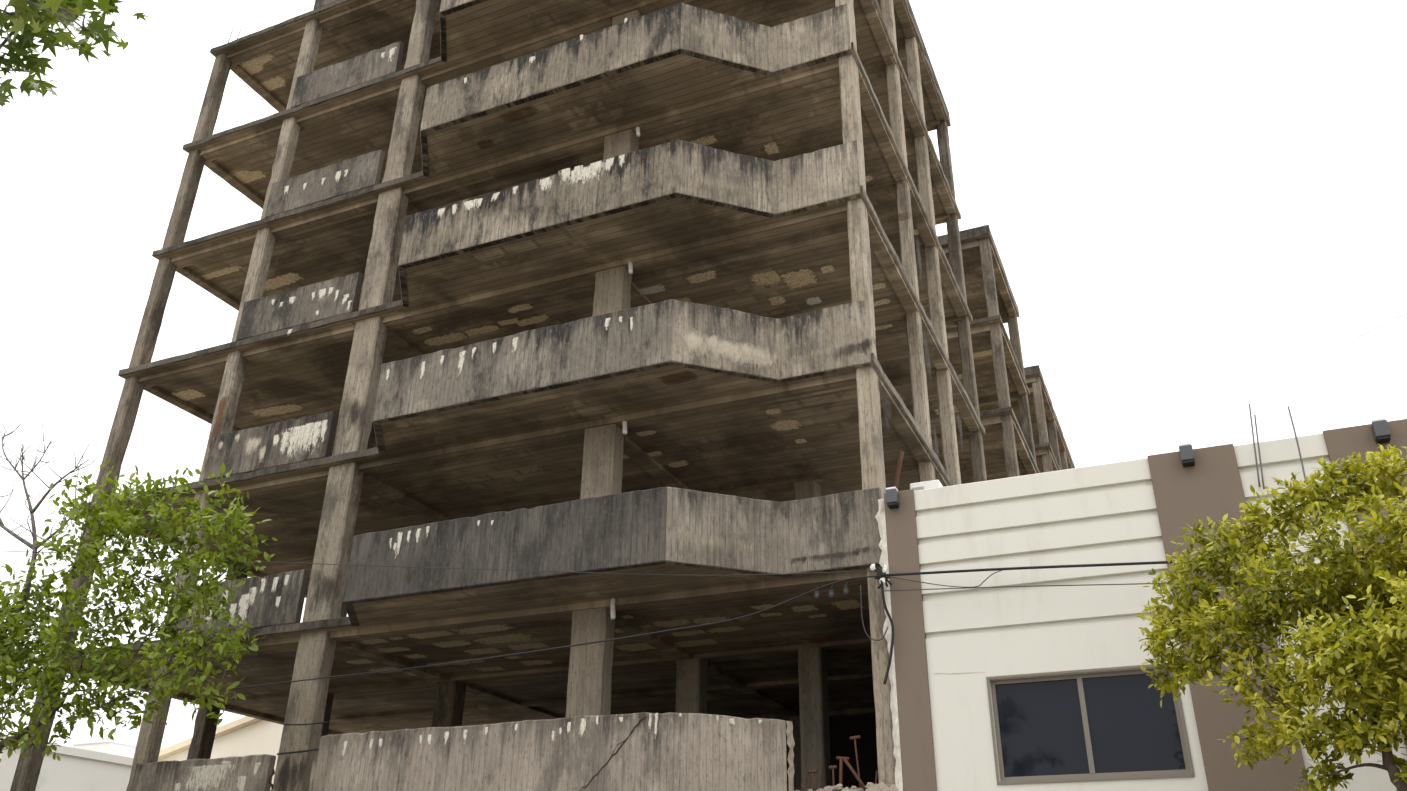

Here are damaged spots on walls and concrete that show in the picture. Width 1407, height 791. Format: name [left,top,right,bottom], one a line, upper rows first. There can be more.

damp [800,339,872,363]
damp [791,547,869,562]
damp [277,750,336,791]
spalling [786,721,899,791]